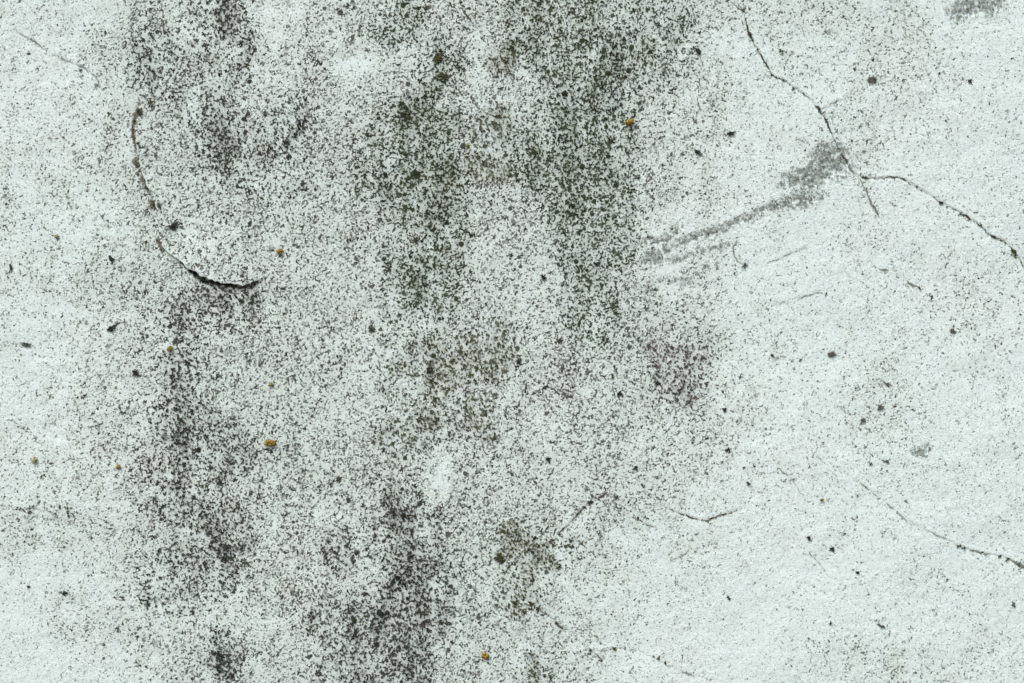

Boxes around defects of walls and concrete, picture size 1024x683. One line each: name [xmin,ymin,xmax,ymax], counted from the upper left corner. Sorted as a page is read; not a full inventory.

mould [125,0,320,204]
mould [351,0,711,460]
crack [733,241,806,278]
crack [731,2,1024,267]
mould [141,282,266,617]
mould [185,626,248,678]
mould [304,485,457,683]
mould [510,653,553,683]
mould [482,518,586,615]
crack [951,541,1024,569]